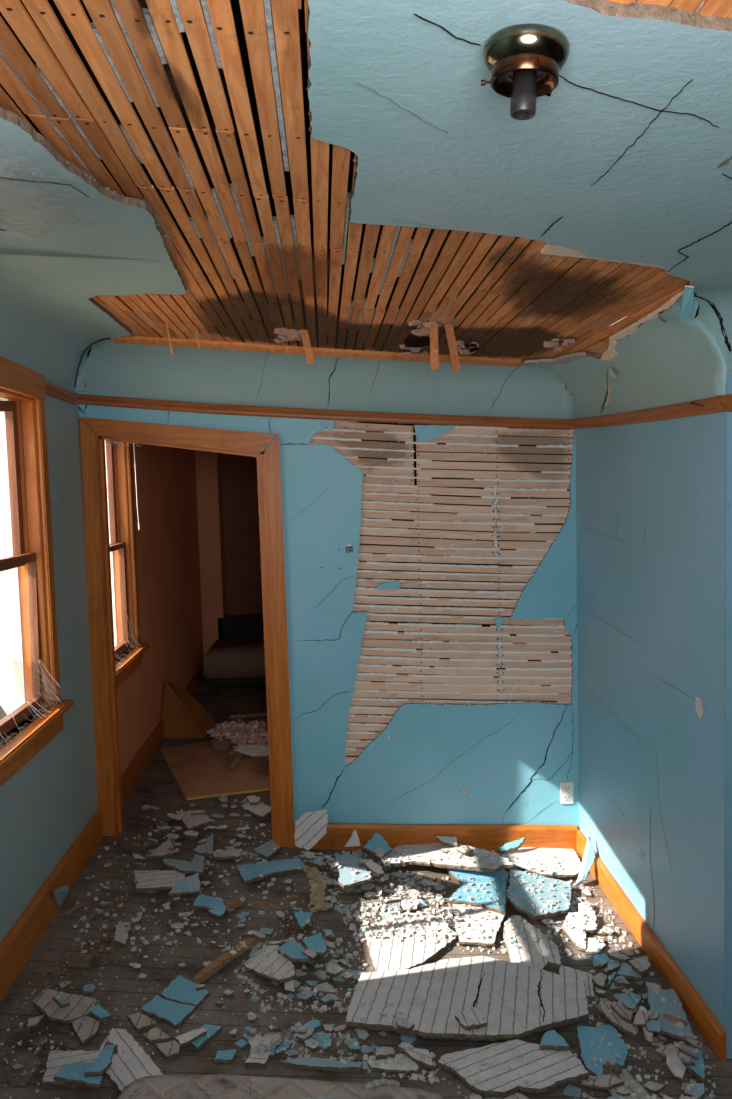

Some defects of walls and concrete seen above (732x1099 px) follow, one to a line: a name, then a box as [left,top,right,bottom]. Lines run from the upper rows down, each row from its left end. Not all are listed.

crack [414,13,481,46]
spalling [595,0,732,25]
crack [353,80,448,134]
crack [559,75,719,187]
crack [0,177,89,197]
spalling [0,0,699,378]
crack [717,157,732,179]
crack [667,222,732,272]
spalling [309,422,575,765]
crack [297,611,367,641]
crack [321,767,345,810]